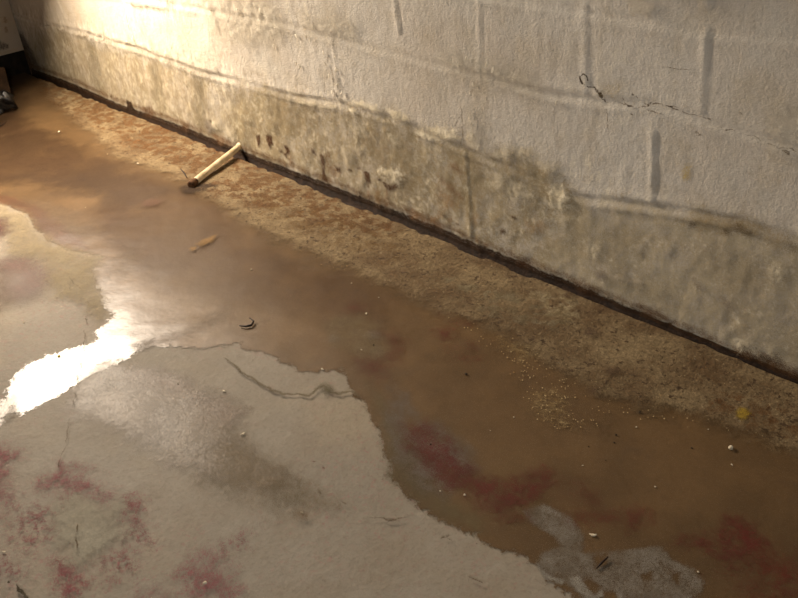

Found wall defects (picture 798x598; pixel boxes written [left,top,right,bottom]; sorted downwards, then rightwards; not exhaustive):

crack [579,74,796,155]
water stain [25,24,798,380]
crack [225,358,359,397]
crack [7,581,28,598]